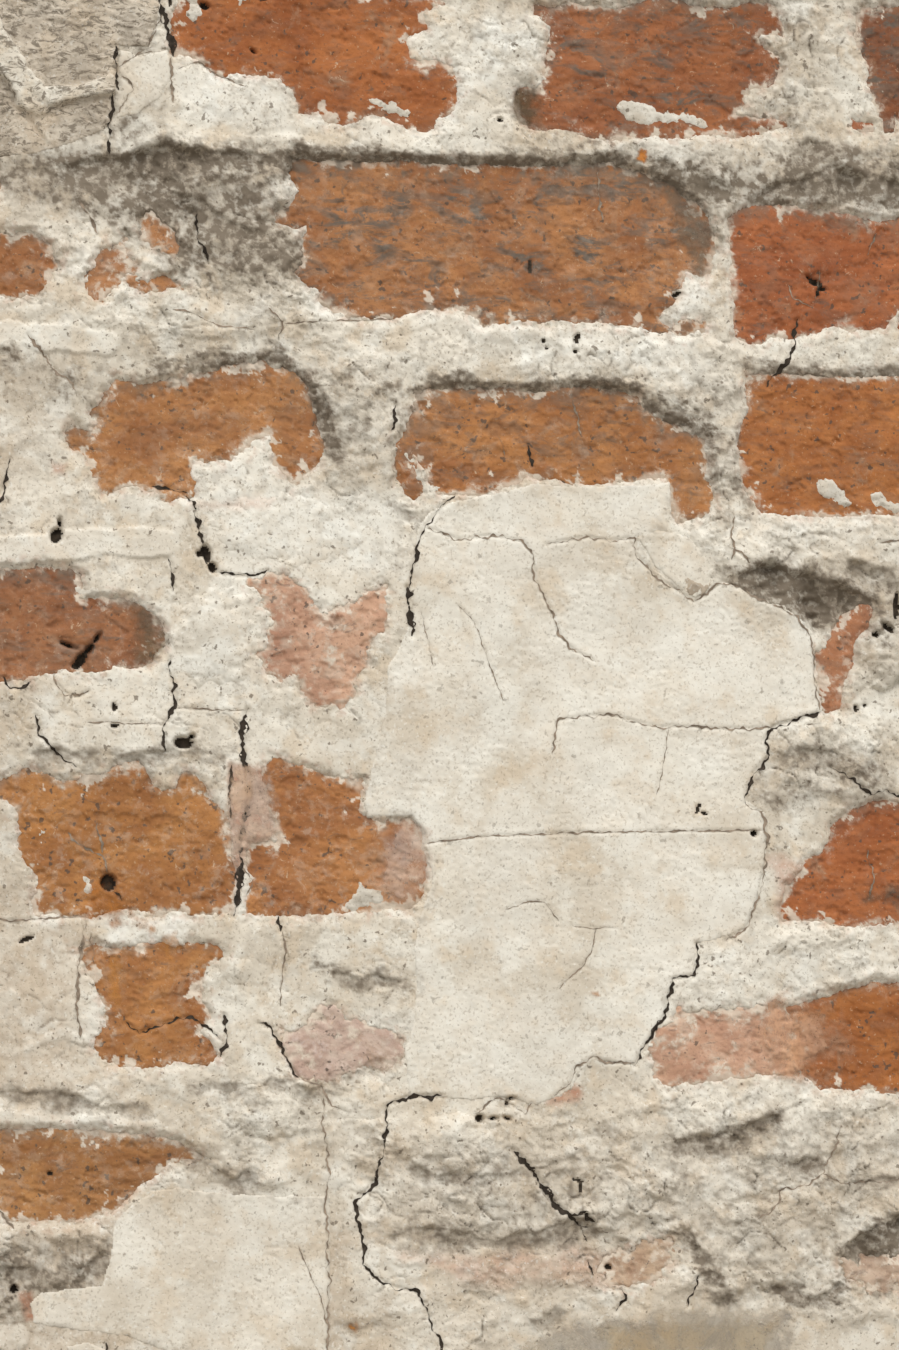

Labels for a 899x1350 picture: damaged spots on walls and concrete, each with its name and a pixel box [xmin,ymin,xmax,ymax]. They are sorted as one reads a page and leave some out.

flaking render [115,0,457,133]
flaking render [497,0,788,142]
flaking render [275,158,899,353]
flaking render [64,359,325,503]
flaking render [737,373,899,517]
crack [4,661,253,915]
flaking render [0,758,427,919]
crack [406,496,821,938]
crack [478,943,700,1114]
crack [262,916,443,1350]
crack [514,1151,595,1275]
water stain [532,1311,790,1350]